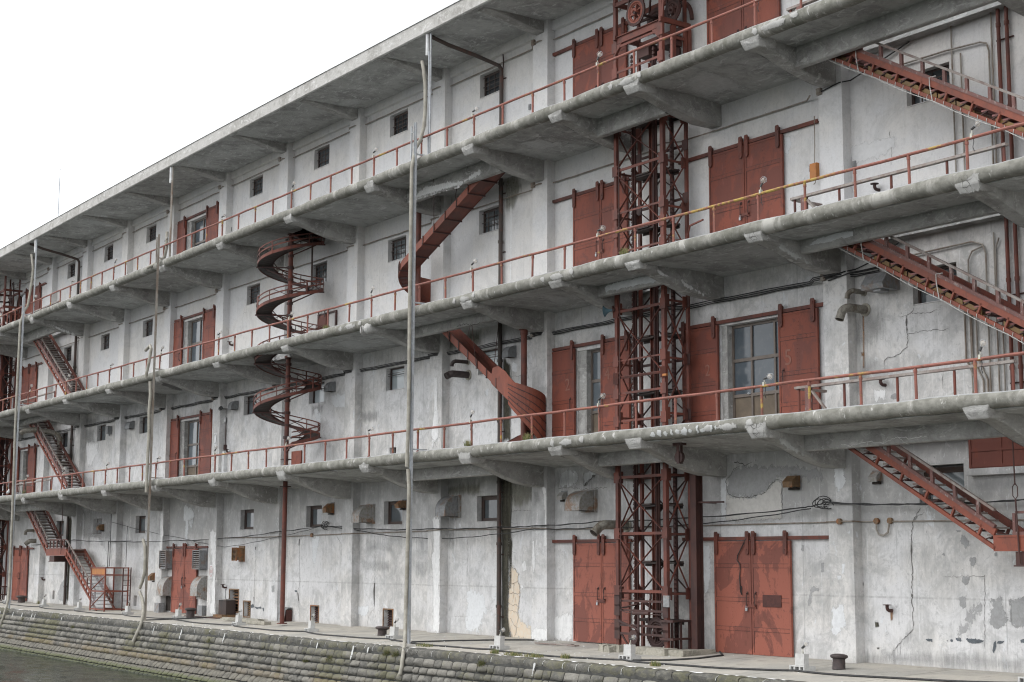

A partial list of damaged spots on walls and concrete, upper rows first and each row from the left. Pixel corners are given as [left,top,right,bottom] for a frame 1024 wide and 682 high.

crack [884,308,948,368]
peeling [502,560,557,654]
crack [891,509,924,655]
peeling [947,530,1024,653]